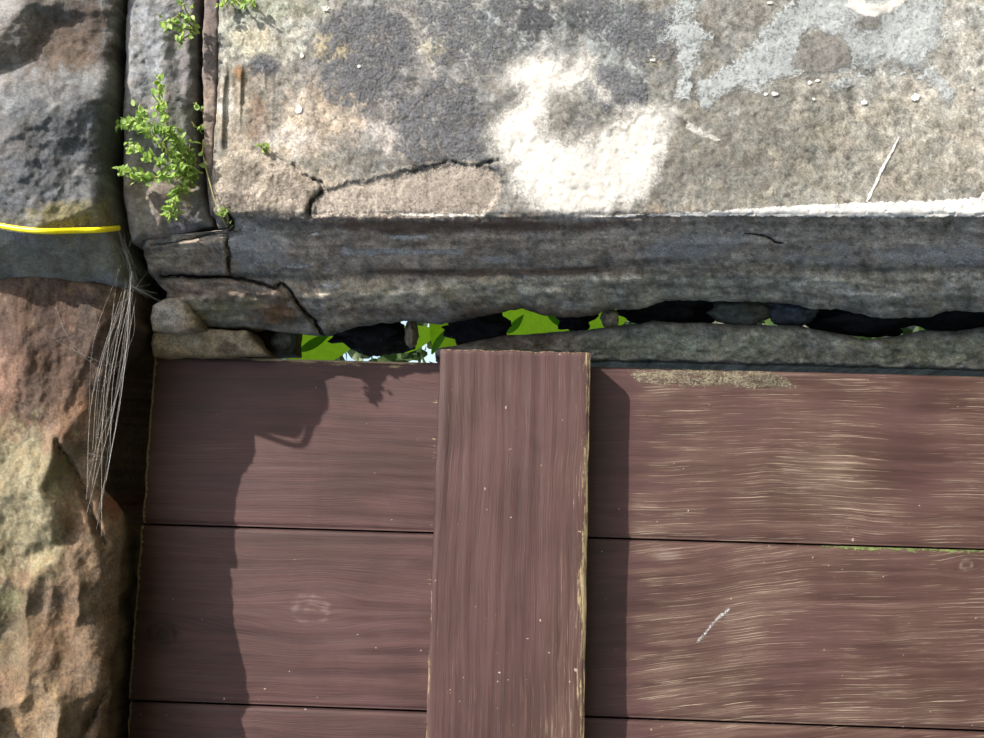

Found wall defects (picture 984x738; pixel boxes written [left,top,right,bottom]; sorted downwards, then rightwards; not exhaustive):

damp [327,0,720,257]
crack [294,165,325,218]
damp [368,256,614,276]